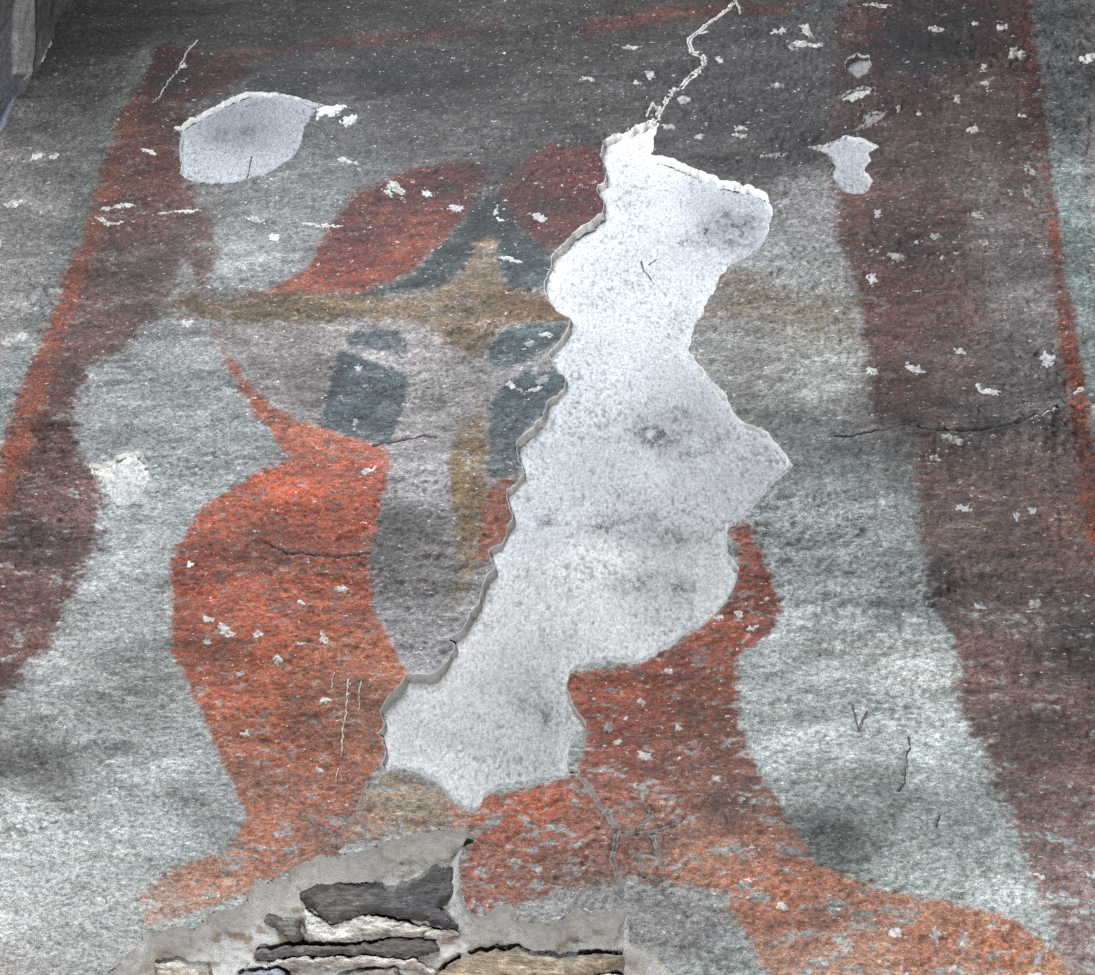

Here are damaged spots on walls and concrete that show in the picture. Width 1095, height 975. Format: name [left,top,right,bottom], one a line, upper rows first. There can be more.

crack [646,0,741,124]
peeling [770,23,824,51]
peeling [838,52,873,103]
flaking render [173,91,358,185]
flaking render [807,105,901,195]
peeling [94,203,136,227]
peeling [975,383,1001,396]
crack [834,404,1058,437]
peeling [88,451,152,511]
flaking render [377,119,794,813]
peeling [202,615,237,646]
flaking render [105,826,676,975]